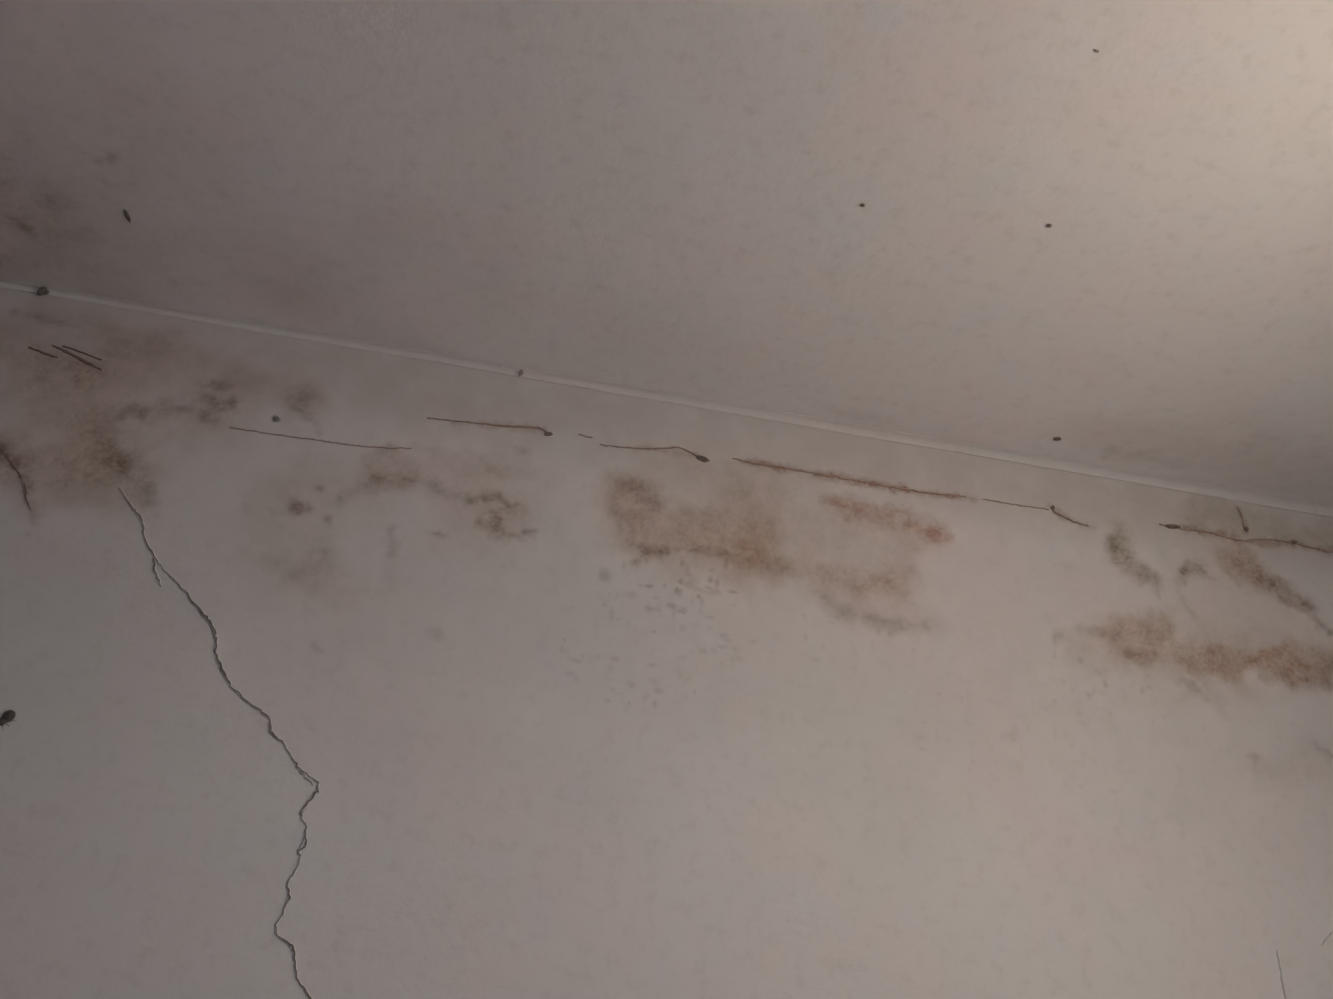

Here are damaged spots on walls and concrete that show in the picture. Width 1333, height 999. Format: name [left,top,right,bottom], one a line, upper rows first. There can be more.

crack [230,427,411,449]
crack [427,417,696,456]
crack [732,458,1088,527]
crack [1159,506,1333,553]
crack [118,487,320,999]